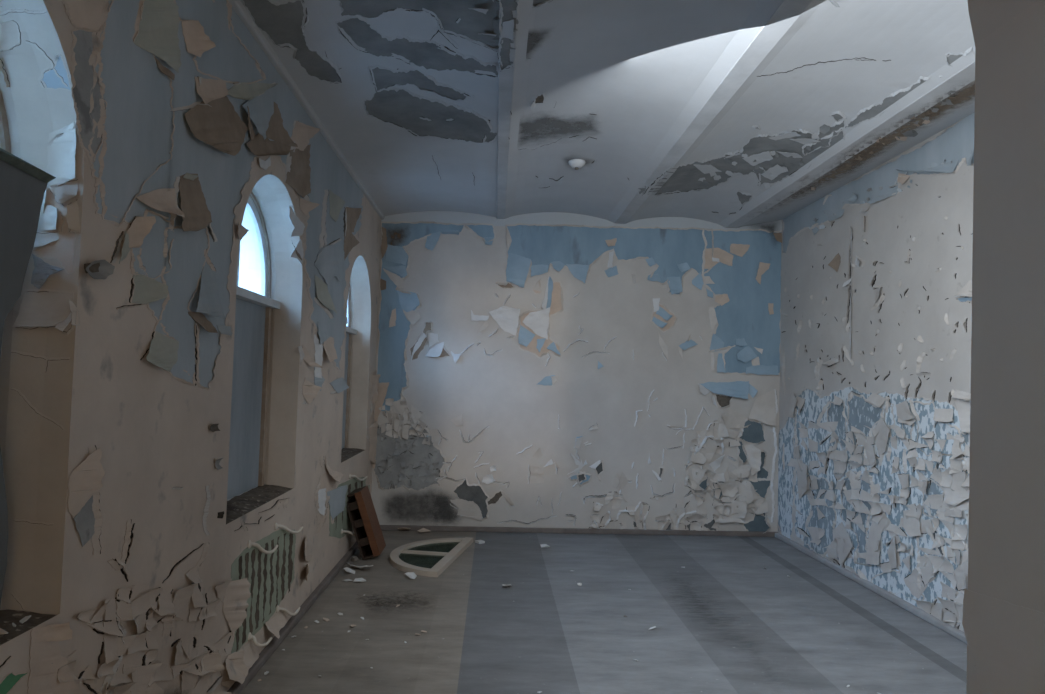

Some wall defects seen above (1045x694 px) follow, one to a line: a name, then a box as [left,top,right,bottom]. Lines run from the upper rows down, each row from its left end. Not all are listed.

peeling [13,0,365,390]
peeling [335,0,530,144]
peeling [626,46,975,216]
crack [756,58,891,78]
peeling [365,112,1045,694]
peeling [314,456,348,534]
leakage [386,495,457,520]